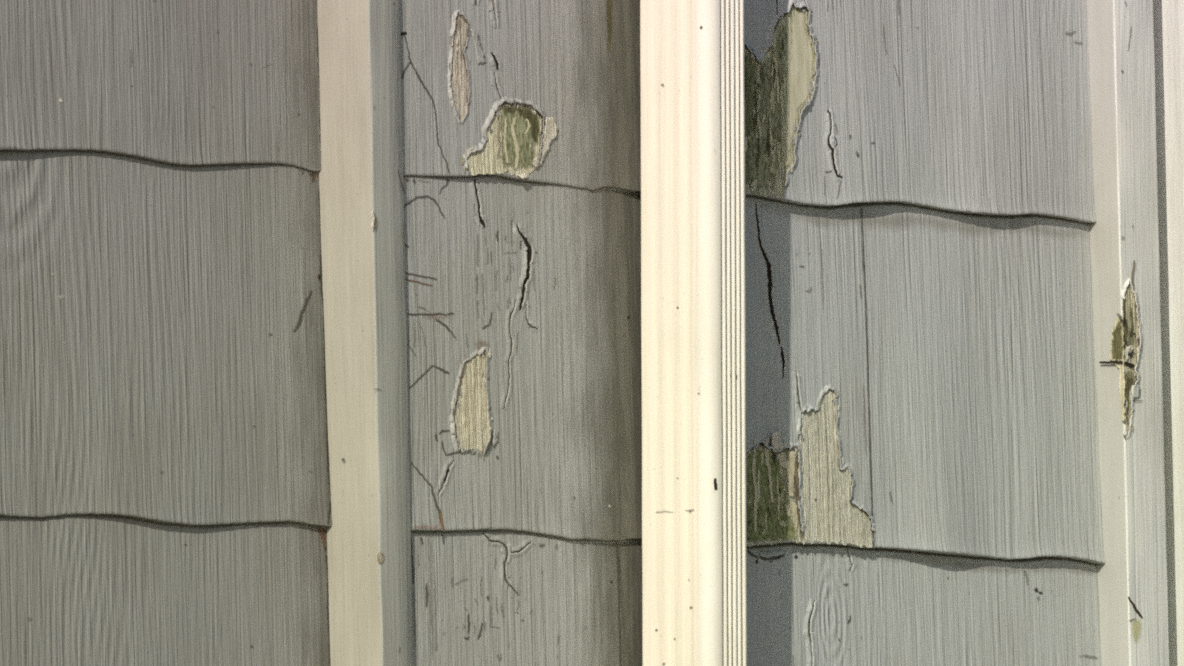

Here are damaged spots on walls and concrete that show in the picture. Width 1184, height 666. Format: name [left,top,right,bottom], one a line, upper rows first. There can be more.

peeling [447,9,486,125]
crack [398,32,539,411]
peeling [461,96,558,179]
peeling [745,0,821,198]
peeling [434,346,499,497]
crack [750,203,817,440]
peeling [746,384,876,564]
peeling [1120,277,1143,441]